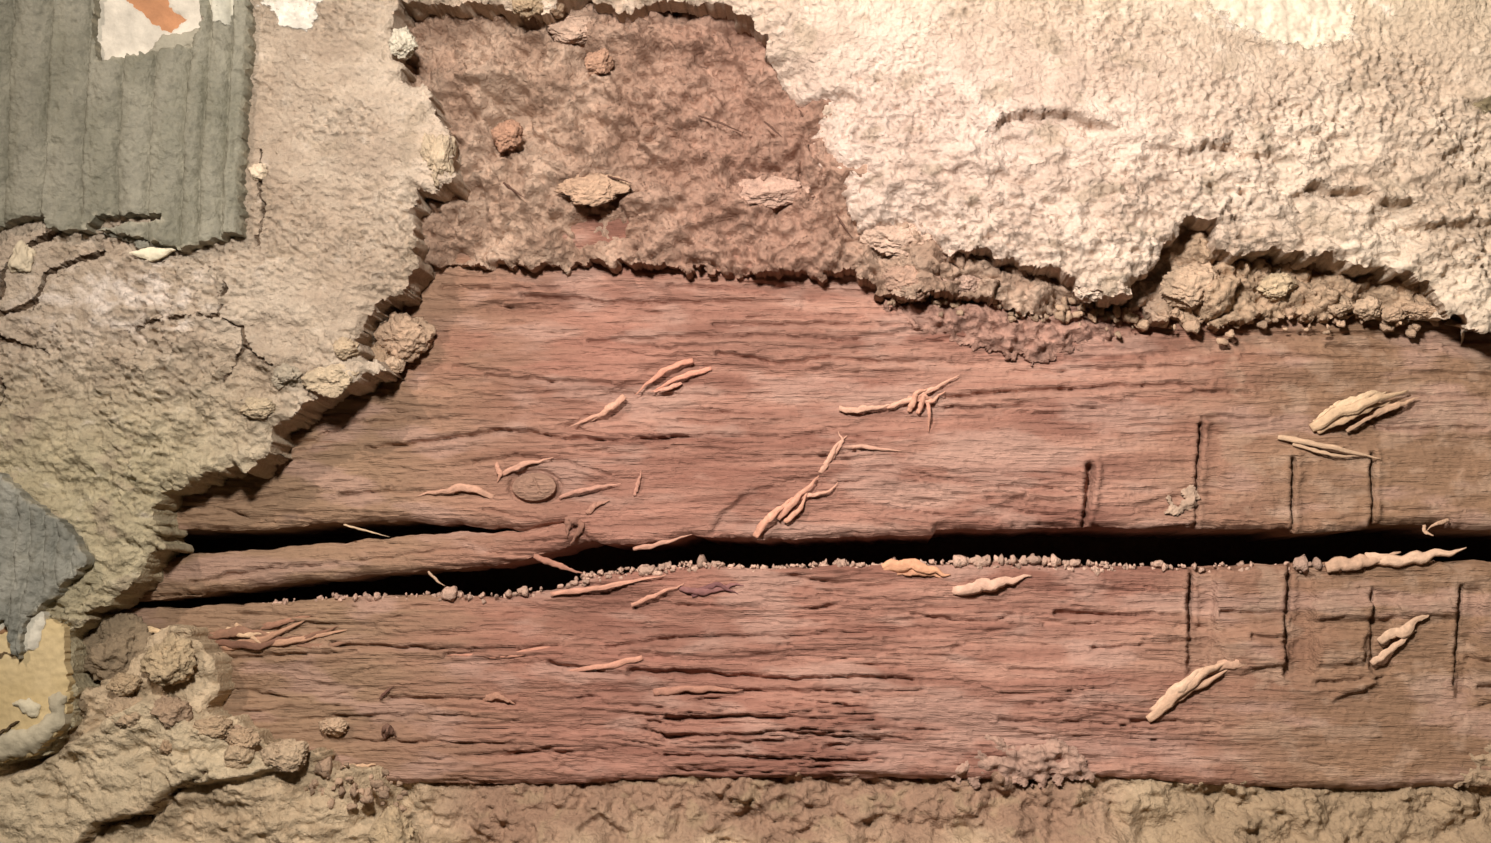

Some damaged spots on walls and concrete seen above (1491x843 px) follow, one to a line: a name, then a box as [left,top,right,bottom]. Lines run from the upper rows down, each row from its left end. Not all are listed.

peeling [0,0,323,262]
crack [255,151,268,246]
flaking render [981,104,1432,232]
flaking render [1443,217,1491,262]
crack [0,231,106,409]
crack [119,280,273,381]
flaking render [215,350,274,397]
peeling [0,472,94,659]